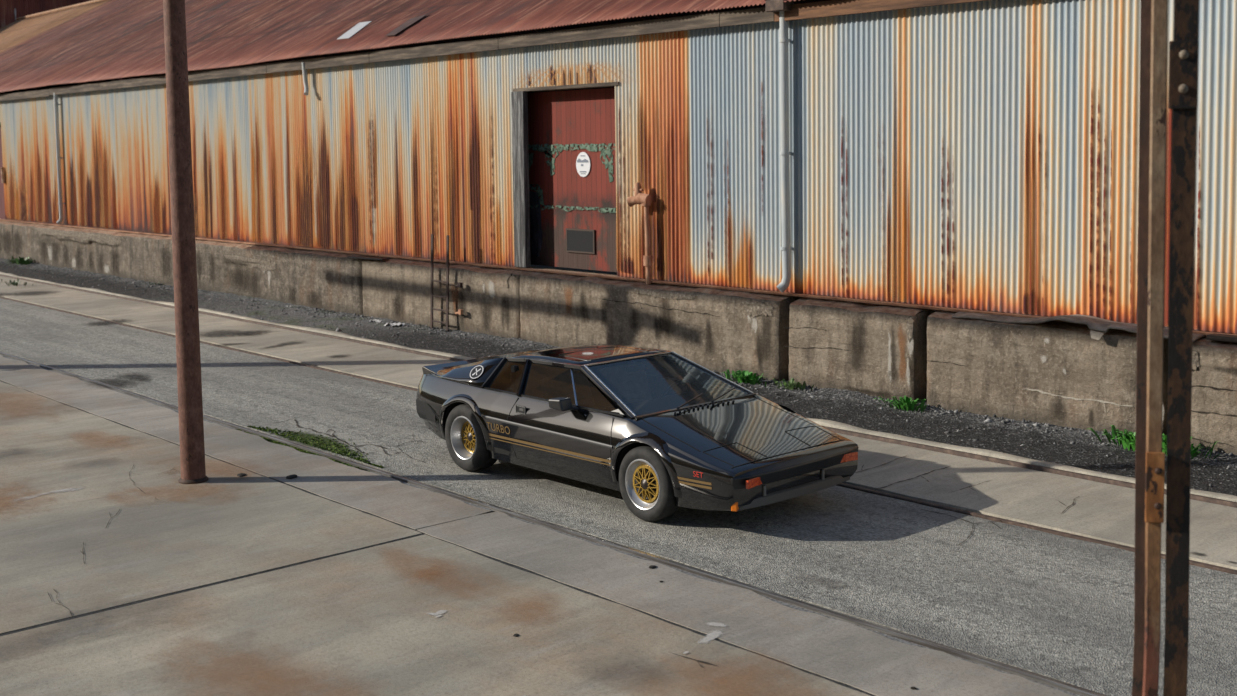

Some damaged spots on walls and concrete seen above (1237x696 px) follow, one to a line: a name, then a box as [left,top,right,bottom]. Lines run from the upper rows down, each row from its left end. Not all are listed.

rust [9,144,116,228]
water stain [41,241,118,273]
rust [193,121,377,252]
rust [395,110,501,264]
rust [617,105,688,281]
rust [1023,109,1046,314]
rust [1164,109,1172,327]
water stain [204,331,267,345]
water stain [483,282,509,328]
water stain [748,315,771,366]
water stain [849,334,913,398]
crack [1191,385,1237,447]